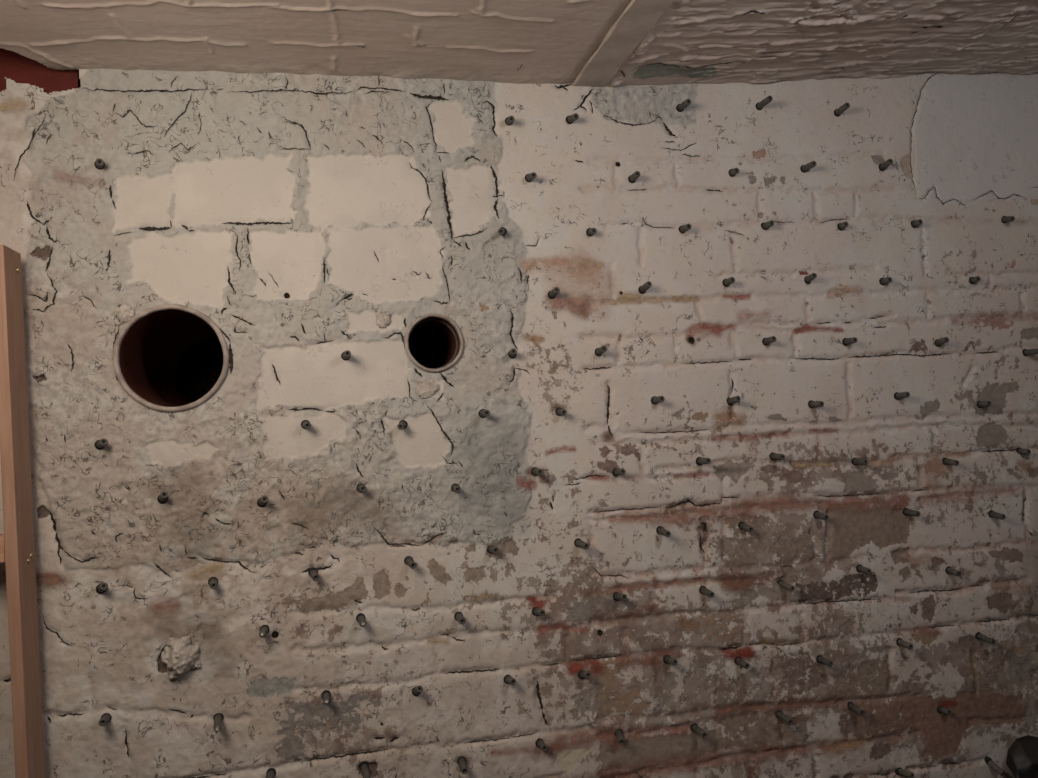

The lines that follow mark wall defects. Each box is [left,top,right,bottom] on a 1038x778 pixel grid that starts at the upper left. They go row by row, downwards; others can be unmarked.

crack [14,113,51,177]
crack [83,76,503,304]
crack [27,202,59,312]
crack [220,222,290,374]
crack [383,319,463,467]
crack [585,367,619,435]
peeling [597,442,641,474]
peeling [712,460,809,484]
peeling [975,379,1020,448]
flaking render [676,503,912,647]
peeling [986,546,1024,614]
flaking render [774,613,1024,760]